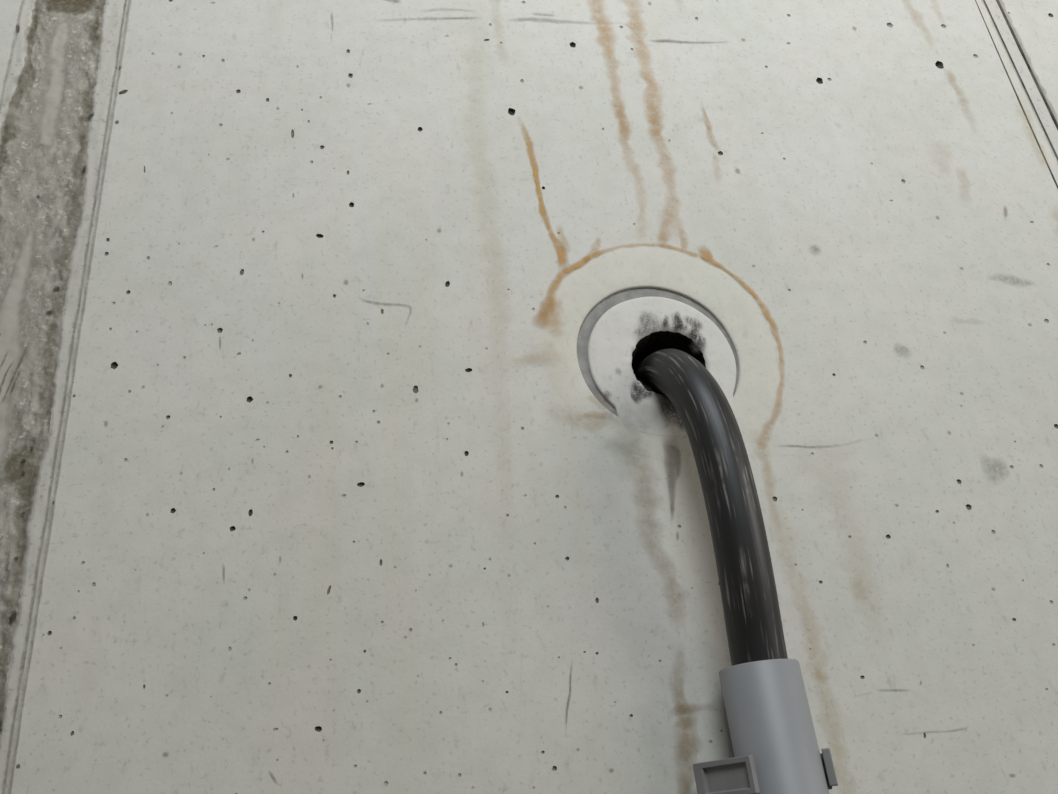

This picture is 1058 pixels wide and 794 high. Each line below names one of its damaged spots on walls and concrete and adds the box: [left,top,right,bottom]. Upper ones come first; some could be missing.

corrosion [527,138,603,316]
water stain [663,315,704,352]
corrosion [702,251,778,340]